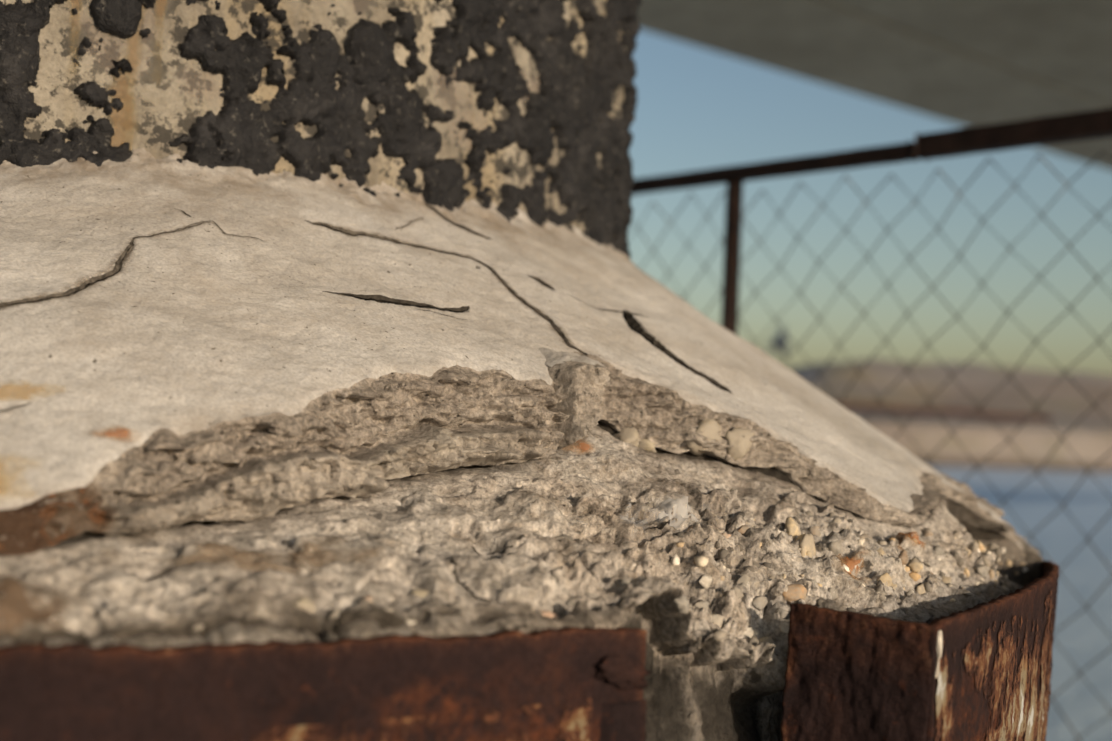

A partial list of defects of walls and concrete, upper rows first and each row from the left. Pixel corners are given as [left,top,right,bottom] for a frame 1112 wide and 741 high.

peeling [112,82,132,147]
crack [0,209,263,308]
crack [304,200,587,355]
spalling [0,364,570,546]
rust [0,486,112,555]
spalling [573,352,1028,660]
spalling [253,609,270,618]
spalling [294,597,344,619]
peeling [935,589,1054,741]